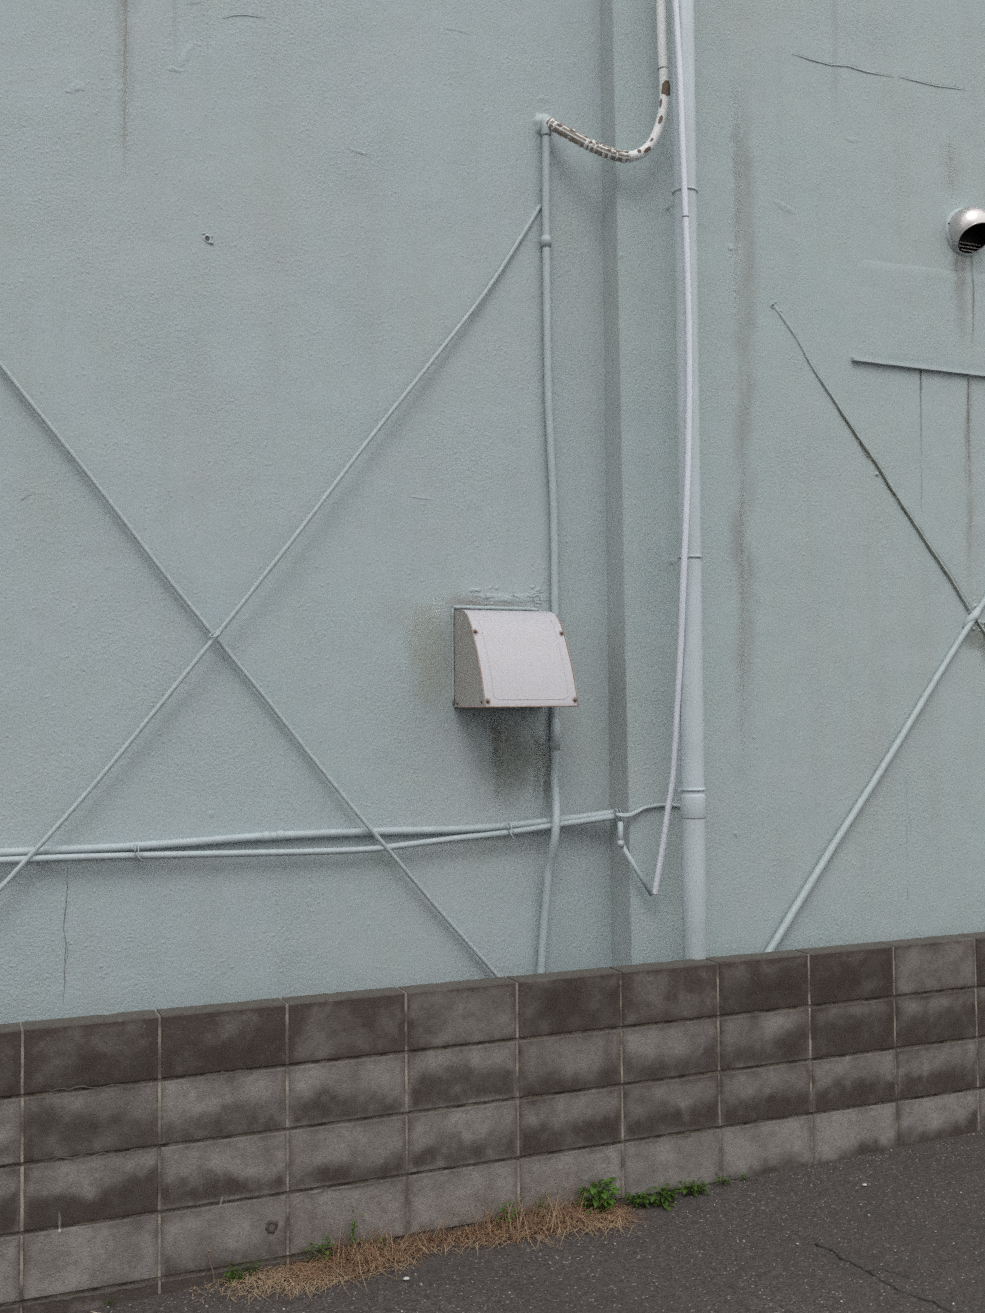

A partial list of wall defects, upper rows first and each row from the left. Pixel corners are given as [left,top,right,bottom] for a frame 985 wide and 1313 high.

crack [793,54,966,90]
crack [806,357,985,633]